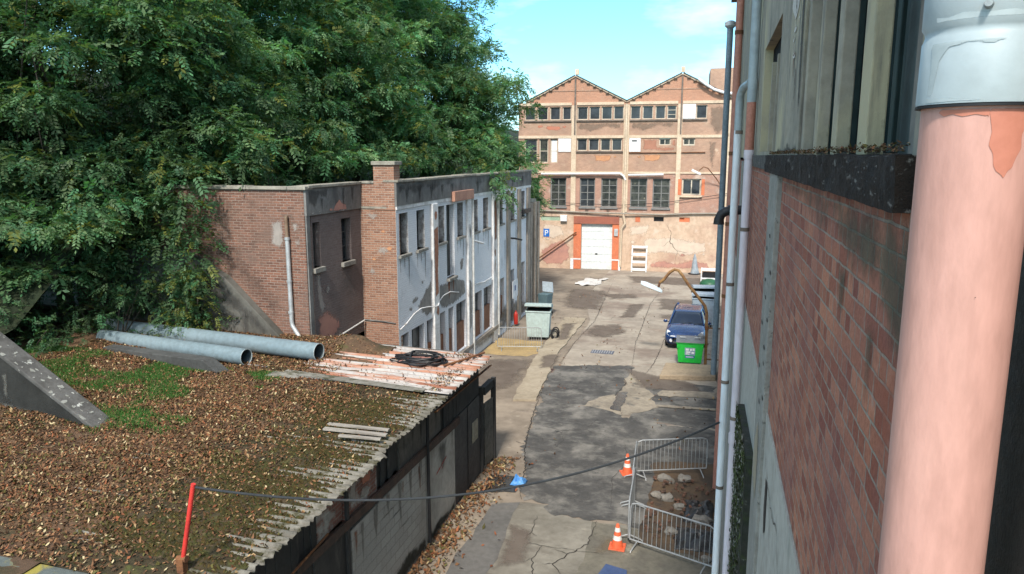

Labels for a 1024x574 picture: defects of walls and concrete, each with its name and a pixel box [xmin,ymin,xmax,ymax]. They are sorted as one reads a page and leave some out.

peeling [926,38,1024,178]
peeling [410,211,472,328]
peeling [542,224,569,264]
crack [519,395,639,574]